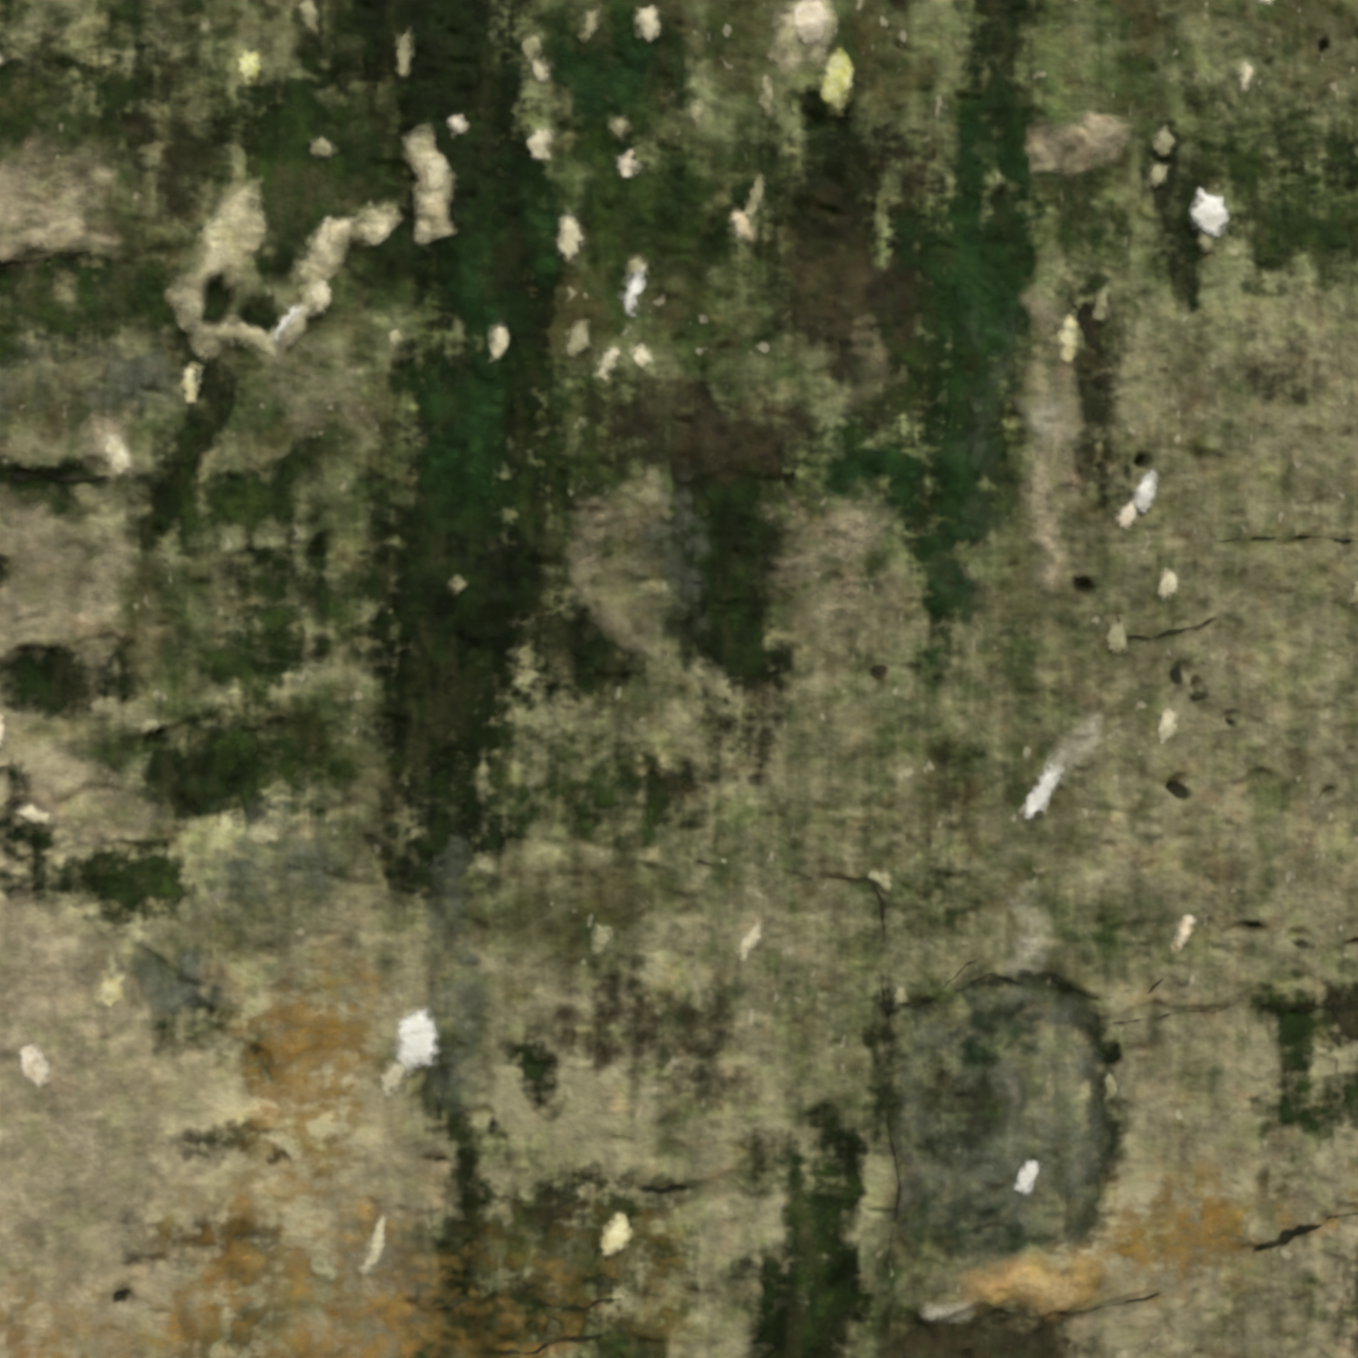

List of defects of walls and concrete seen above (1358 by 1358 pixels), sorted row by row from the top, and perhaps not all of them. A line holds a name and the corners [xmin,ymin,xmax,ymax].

peeling [1028,113,1129,173]
spalling [172,49,452,355]
flaking render [183,367,196,402]
peeling [1025,297,1078,584]
leakage [129,0,1045,1015]
leakage [508,960,736,1106]
leakage [863,986,897,1066]
leakage [740,1088,924,1358]
rust [1116,1187,1242,1277]
crack [1255,1213,1358,1251]
rust [328,1295,424,1358]
crack [1094,1293,1160,1310]